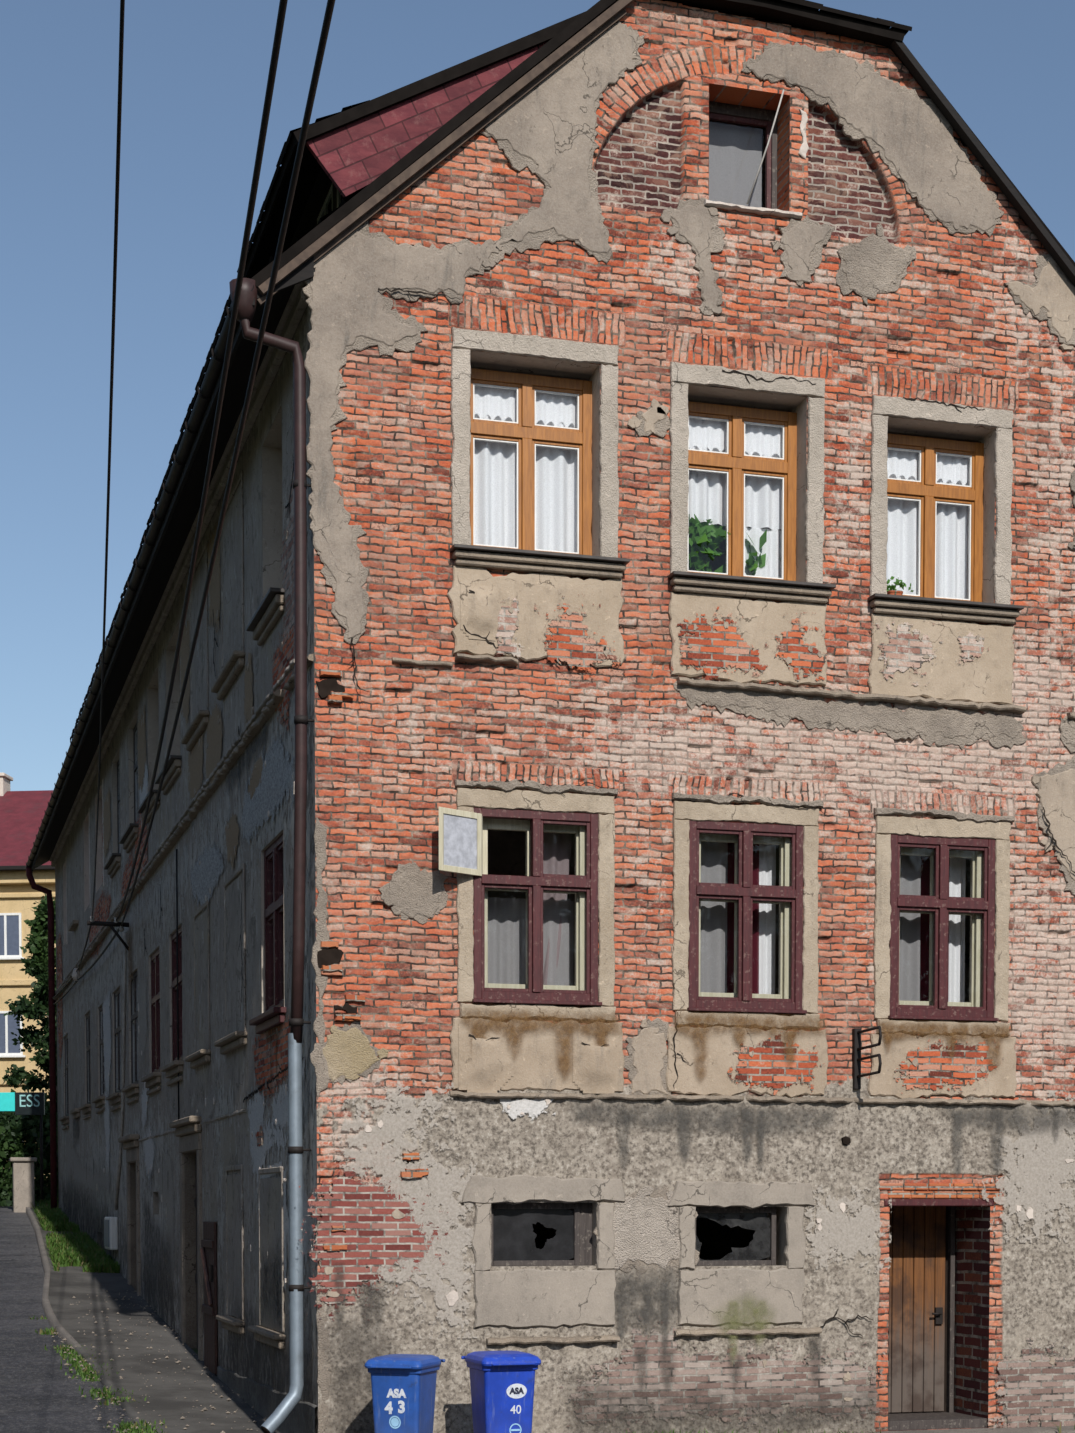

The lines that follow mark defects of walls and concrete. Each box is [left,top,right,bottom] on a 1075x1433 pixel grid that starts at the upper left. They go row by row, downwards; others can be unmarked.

peeling [741,41,1004,237]
peeling [302,21,645,645]
peeling [660,198,726,316]
peeling [770,215,916,306]
peeling [1004,254,1075,351]
spalling [316,669,353,704]
flaking render [496,594,626,677]
peeling [671,607,1027,750]
peeling [378,862,448,925]
flaking render [724,1031,823,1095]
flaking render [283,1152,448,1322]
leakage [614,1277,679,1354]